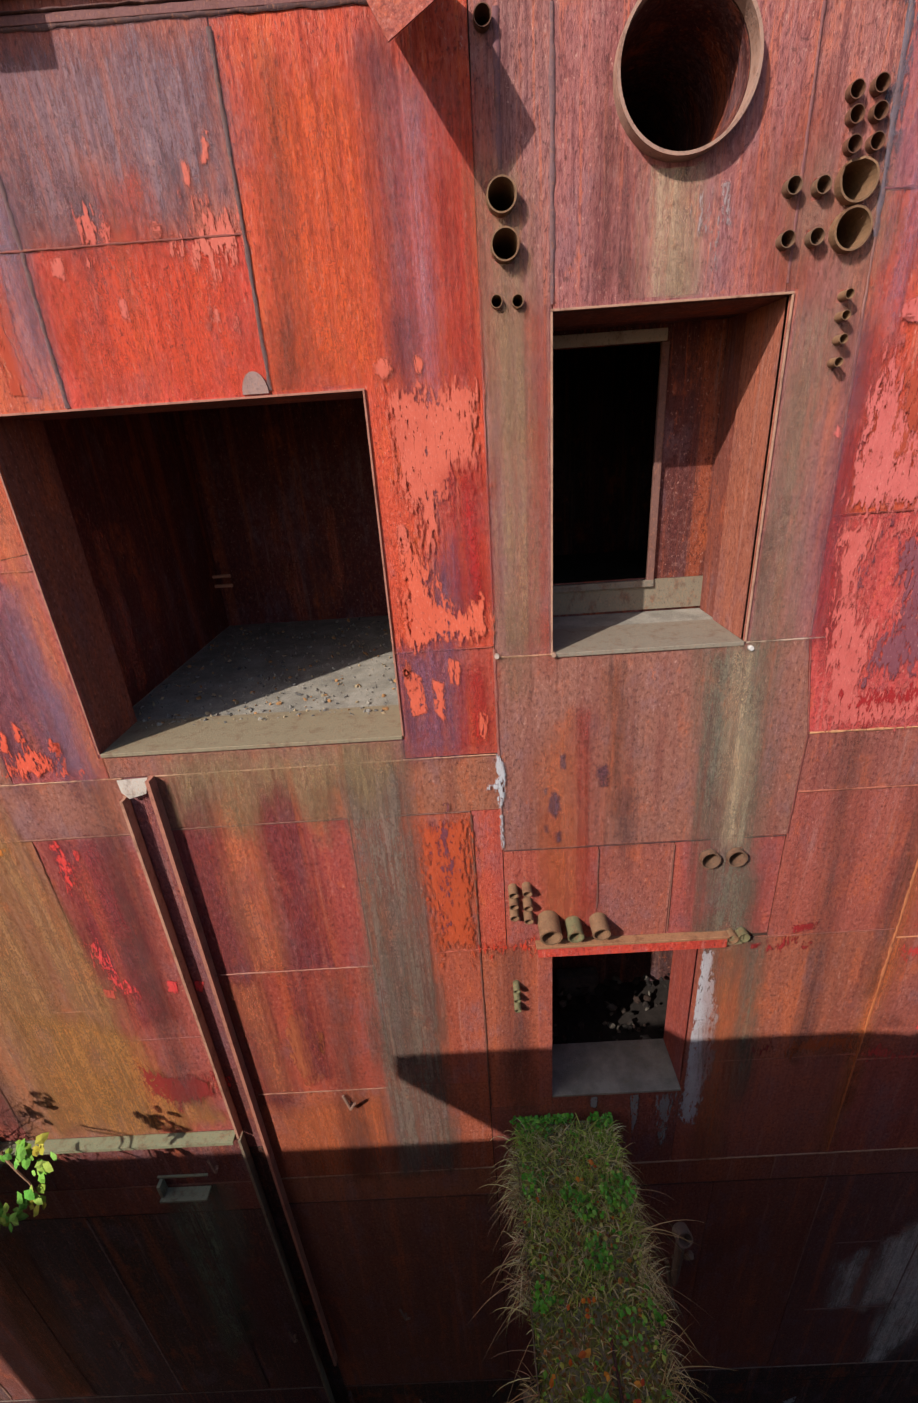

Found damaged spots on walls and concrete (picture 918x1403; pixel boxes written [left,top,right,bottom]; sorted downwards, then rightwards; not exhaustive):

peeling [374,355,497,721]
leakage [630,82,903,1146]
peeling [812,297,918,733]
peeling [0,723,84,782]
peeling [479,712,488,739]
corrosion [413,803,538,968]
efflorescence [830,1227,918,1361]